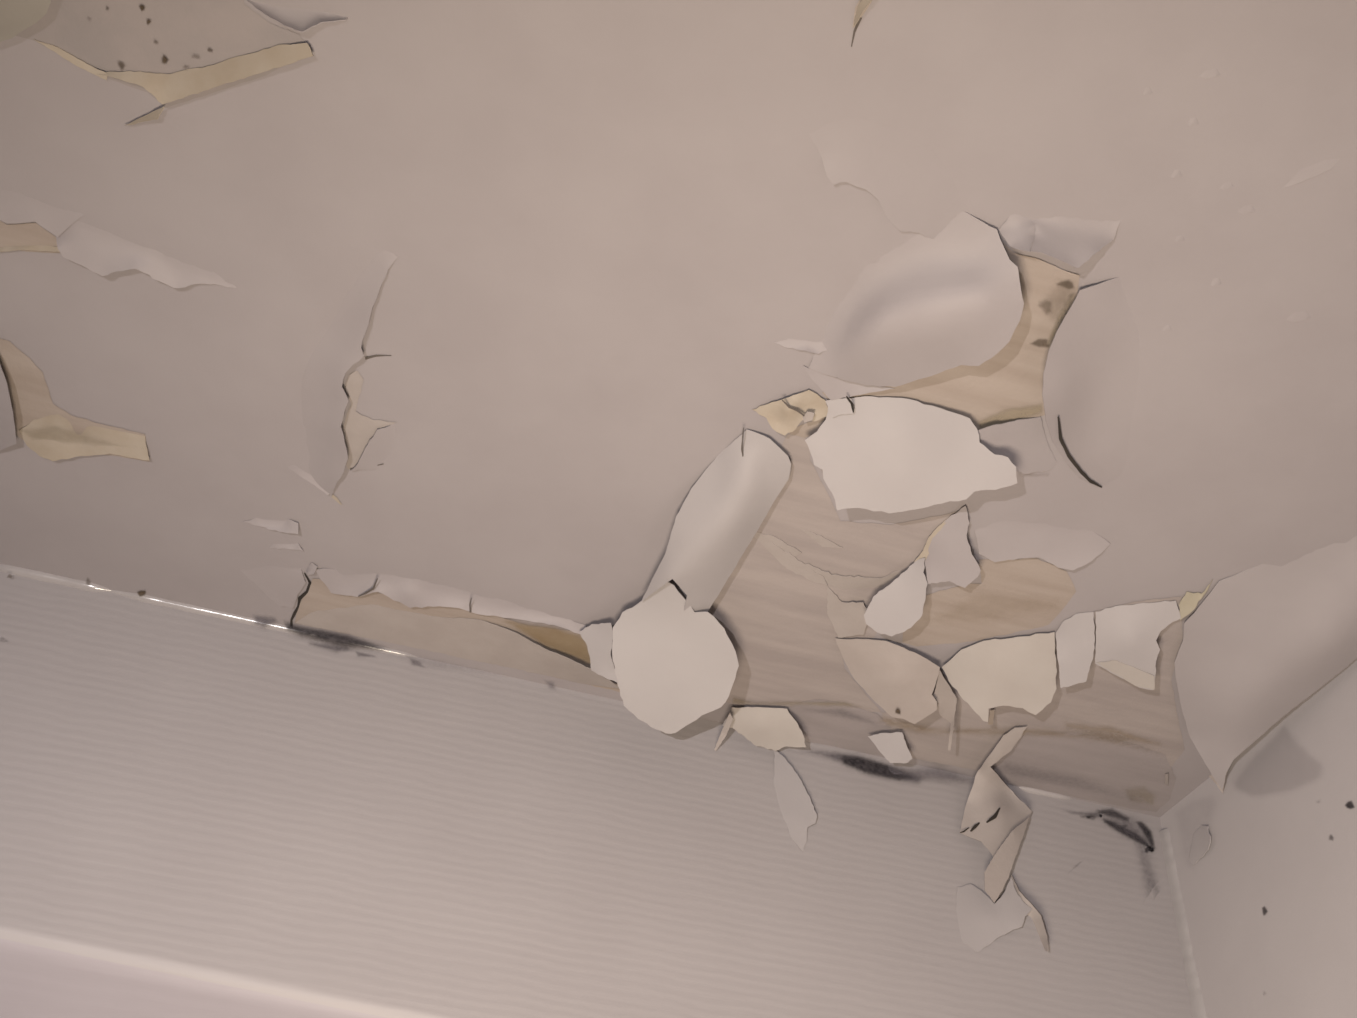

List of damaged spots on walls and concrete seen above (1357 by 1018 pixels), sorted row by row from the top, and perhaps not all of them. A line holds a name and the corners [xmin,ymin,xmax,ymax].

peeling [0,0,348,126]
peeling [851,0,872,47]
peeling [0,190,236,288]
peeling [0,338,150,462]
crack [287,250,398,505]
peeling [240,211,1213,953]
water stain [1087,810,1154,852]